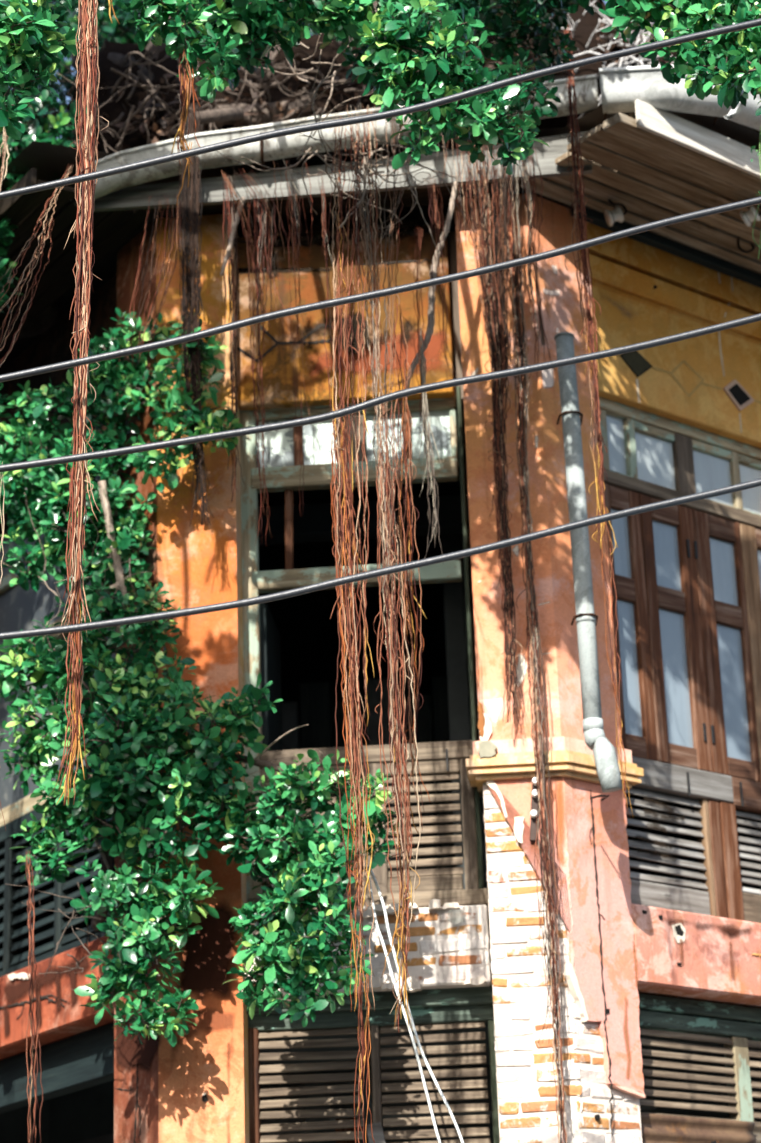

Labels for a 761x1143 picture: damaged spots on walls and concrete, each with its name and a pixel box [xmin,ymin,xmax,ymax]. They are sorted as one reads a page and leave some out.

peeling [309,312,446,376]
spalling [318,780,645,1143]